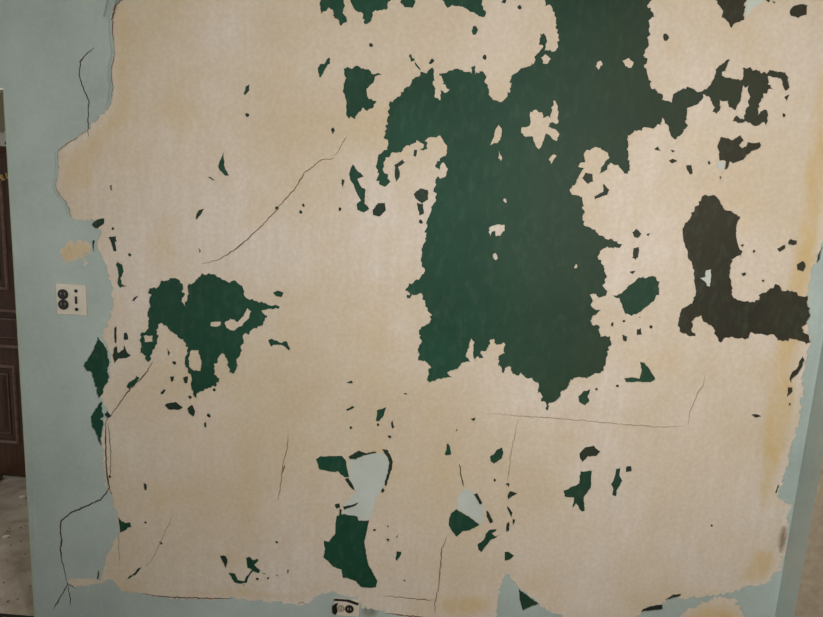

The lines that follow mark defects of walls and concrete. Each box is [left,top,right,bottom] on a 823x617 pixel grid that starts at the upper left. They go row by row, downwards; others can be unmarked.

peeling [343,66,381,119]
crack [202,138,346,264]
peeling [376,0,789,410]
water stain [784,51,823,308]
peeling [84,337,109,397]
peeling [140,273,280,398]
peeling [678,195,812,383]
water stain [757,324,808,518]
crack [54,363,152,608]
peeling [323,514,377,588]
peeling [343,449,393,521]
peeling [564,471,592,511]